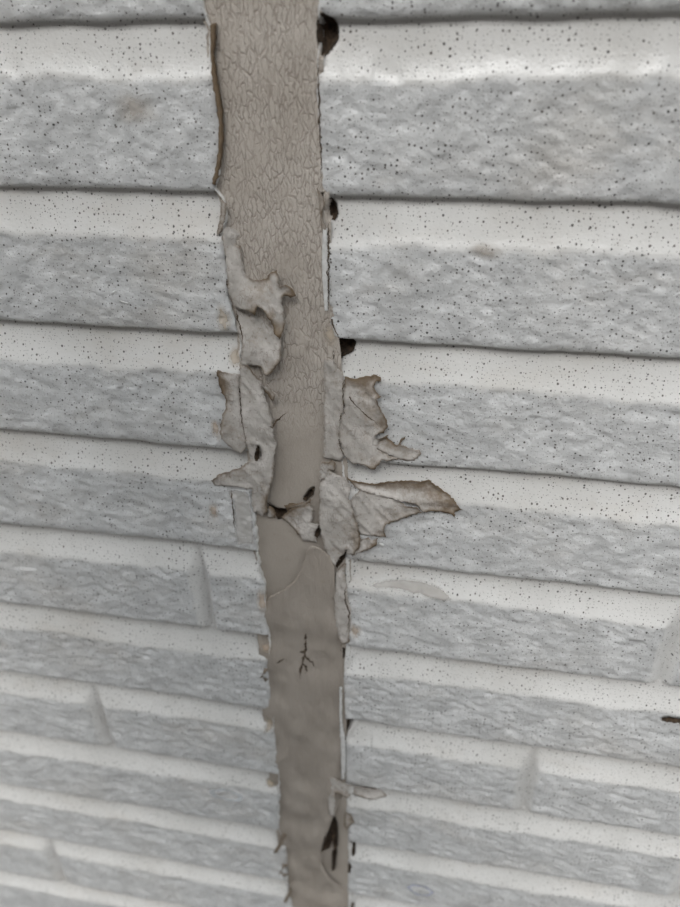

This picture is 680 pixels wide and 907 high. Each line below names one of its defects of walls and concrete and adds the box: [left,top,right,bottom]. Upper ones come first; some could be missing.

peeling [211,226,296,516]
peeling [323,359,421,470]
peeling [319,470,462,566]